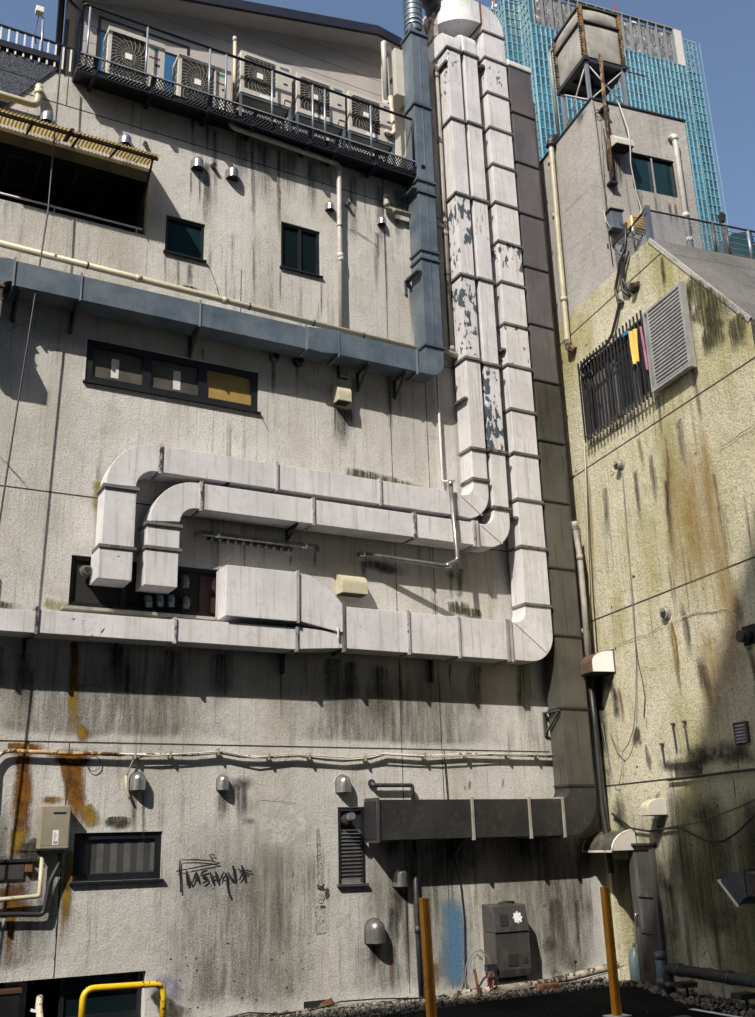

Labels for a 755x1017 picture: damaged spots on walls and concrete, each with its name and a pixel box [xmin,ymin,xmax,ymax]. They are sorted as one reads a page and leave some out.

leakage [686,278,745,351]
corrosion [668,622,679,673]
leakage [698,592,739,699]
corrosion [8,642,121,853]
corrosion [61,852,73,921]